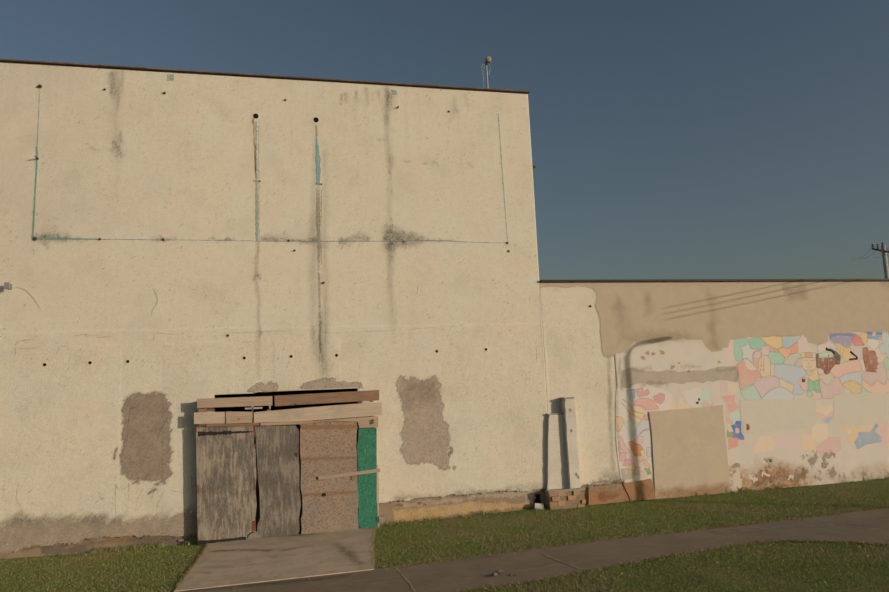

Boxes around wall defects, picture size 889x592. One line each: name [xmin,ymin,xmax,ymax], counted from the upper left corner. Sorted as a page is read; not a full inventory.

spalling [729,453,836,492]